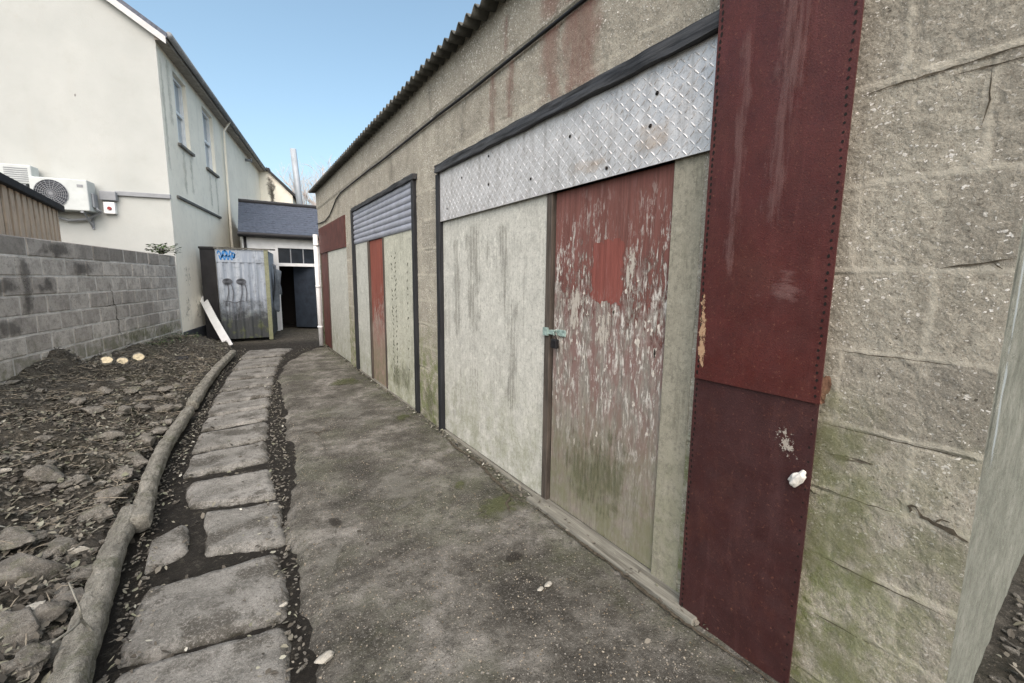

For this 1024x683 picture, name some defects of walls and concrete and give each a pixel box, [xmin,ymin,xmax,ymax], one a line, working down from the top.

crack [855,45,1024,128]
crack [940,259,1009,269]
peeling [556,247,660,401]
corrosion [698,294,706,367]
crack [810,485,968,542]